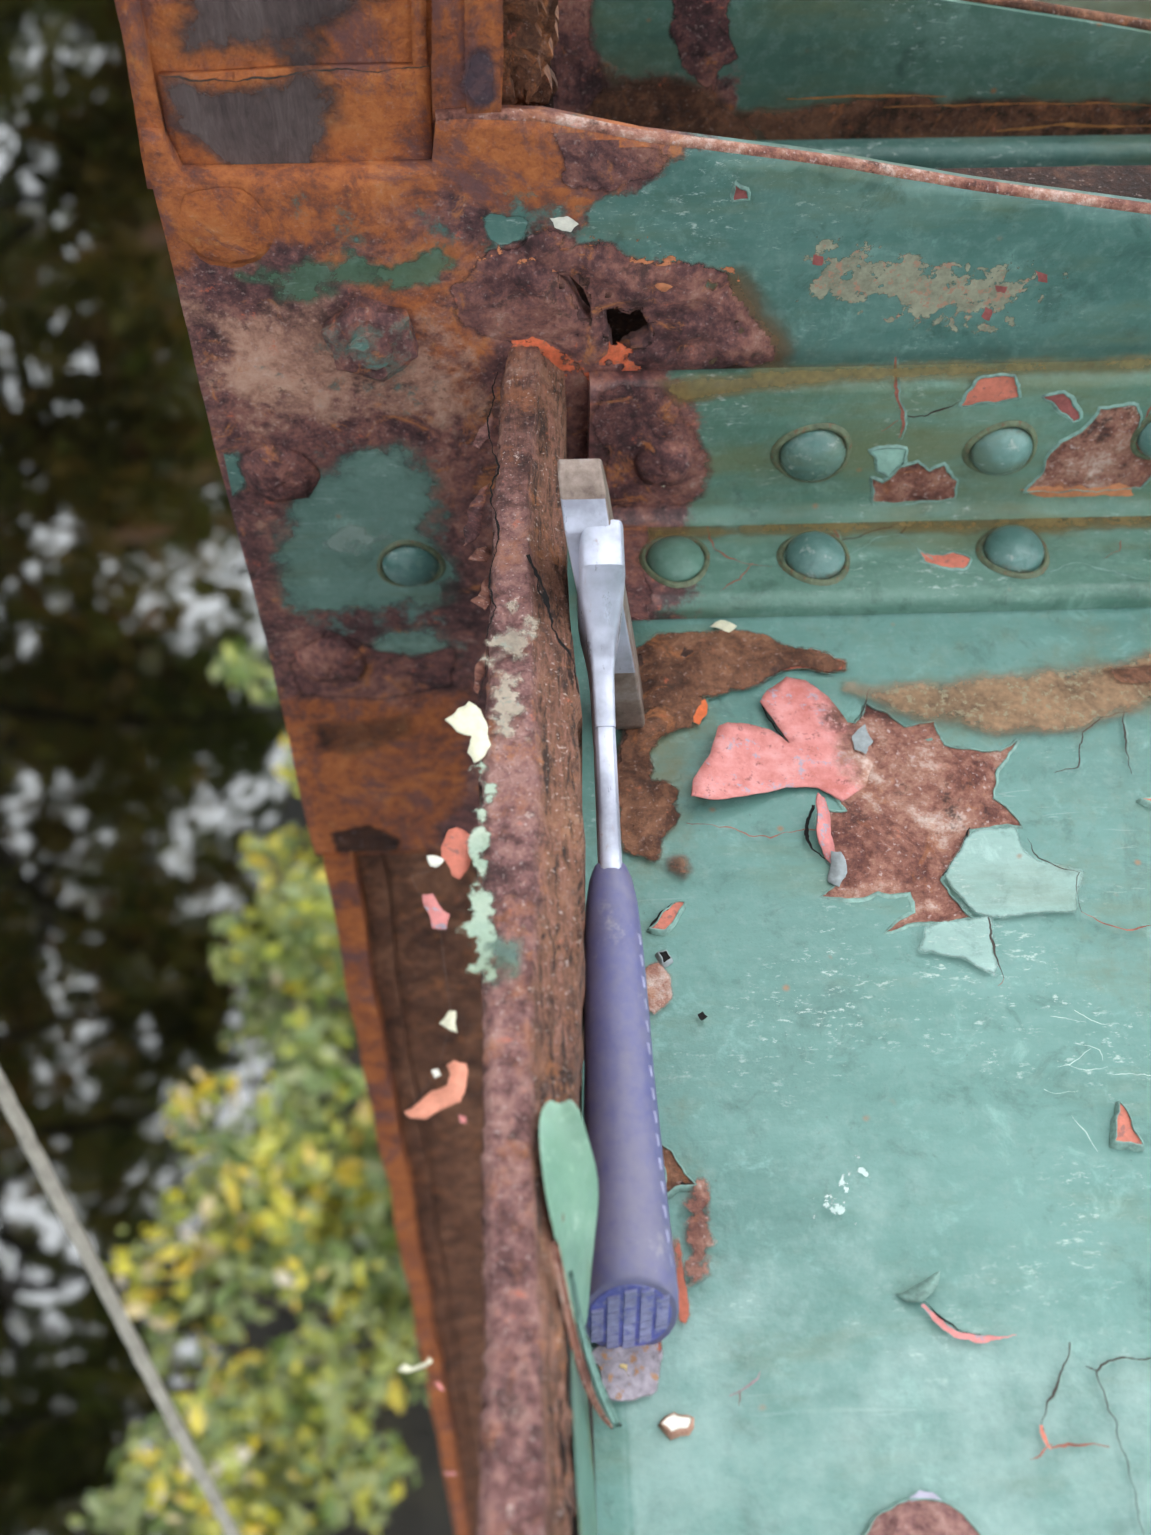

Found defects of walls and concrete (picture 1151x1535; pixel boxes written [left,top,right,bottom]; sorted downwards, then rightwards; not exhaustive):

rust [552,0,1151,140]
rust [552,133,669,192]
rust [450,216,1151,508]
peeling [1022,390,1151,497]
peeling [445,701,491,763]
rust [617,516,1151,877]
rust [331,825,400,852]
peeling [427,827,471,880]
peeling [691,677,1083,972]
peeling [422,893,450,930]
crack [1001,1342,1151,1534]
peeling [861,1490,983,1535]